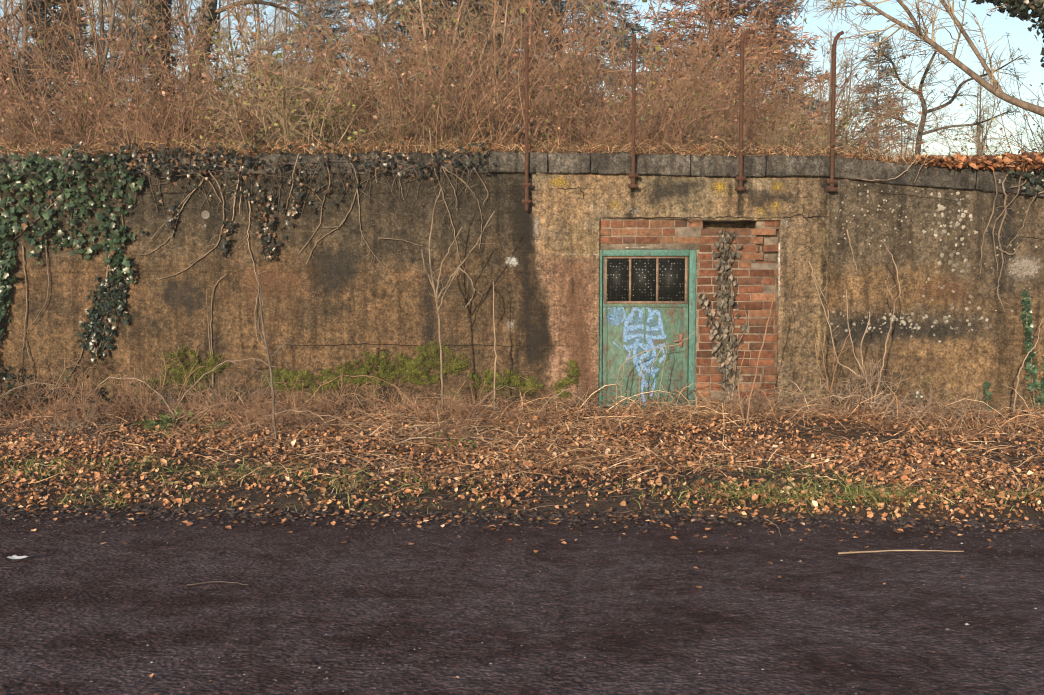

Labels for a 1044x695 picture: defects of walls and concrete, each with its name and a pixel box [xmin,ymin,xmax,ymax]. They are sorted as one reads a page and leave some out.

damp [509,188,548,373]
damp [845,318,956,340]